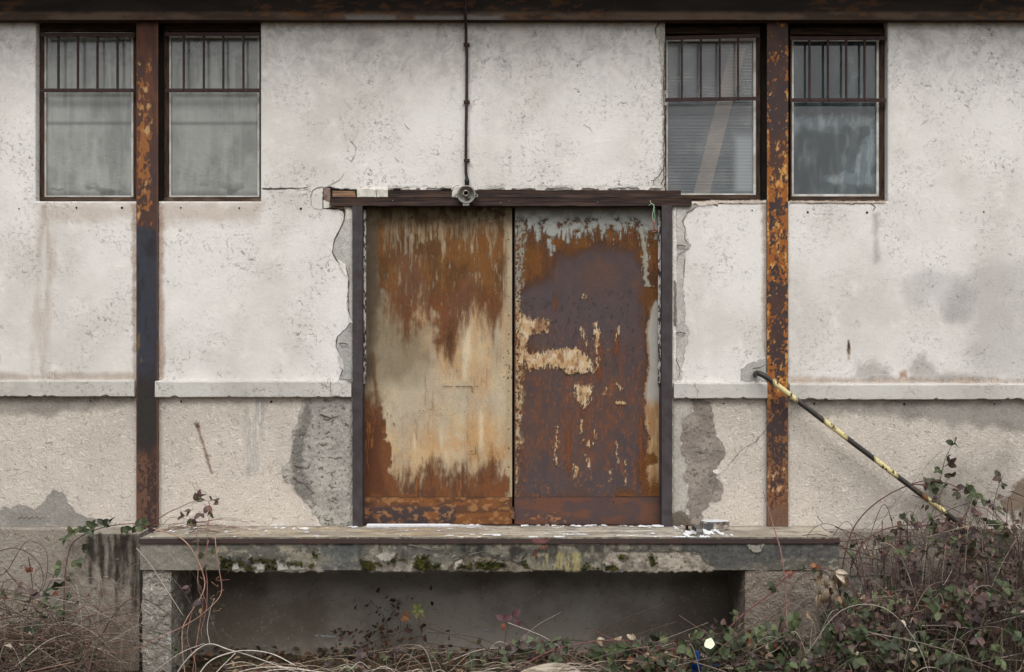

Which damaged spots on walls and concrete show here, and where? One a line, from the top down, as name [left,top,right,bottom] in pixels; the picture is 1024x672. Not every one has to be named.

crack [262,142,356,209]
flaking render [322,185,461,384]
corrosion [377,217,658,360]
peeling [504,205,699,485]
flaking render [0,490,110,527]
water stain [85,533,138,610]
flaking render [282,397,352,526]
corrosion [365,353,510,497]
corrosion [616,419,659,496]
flaking render [672,398,726,526]